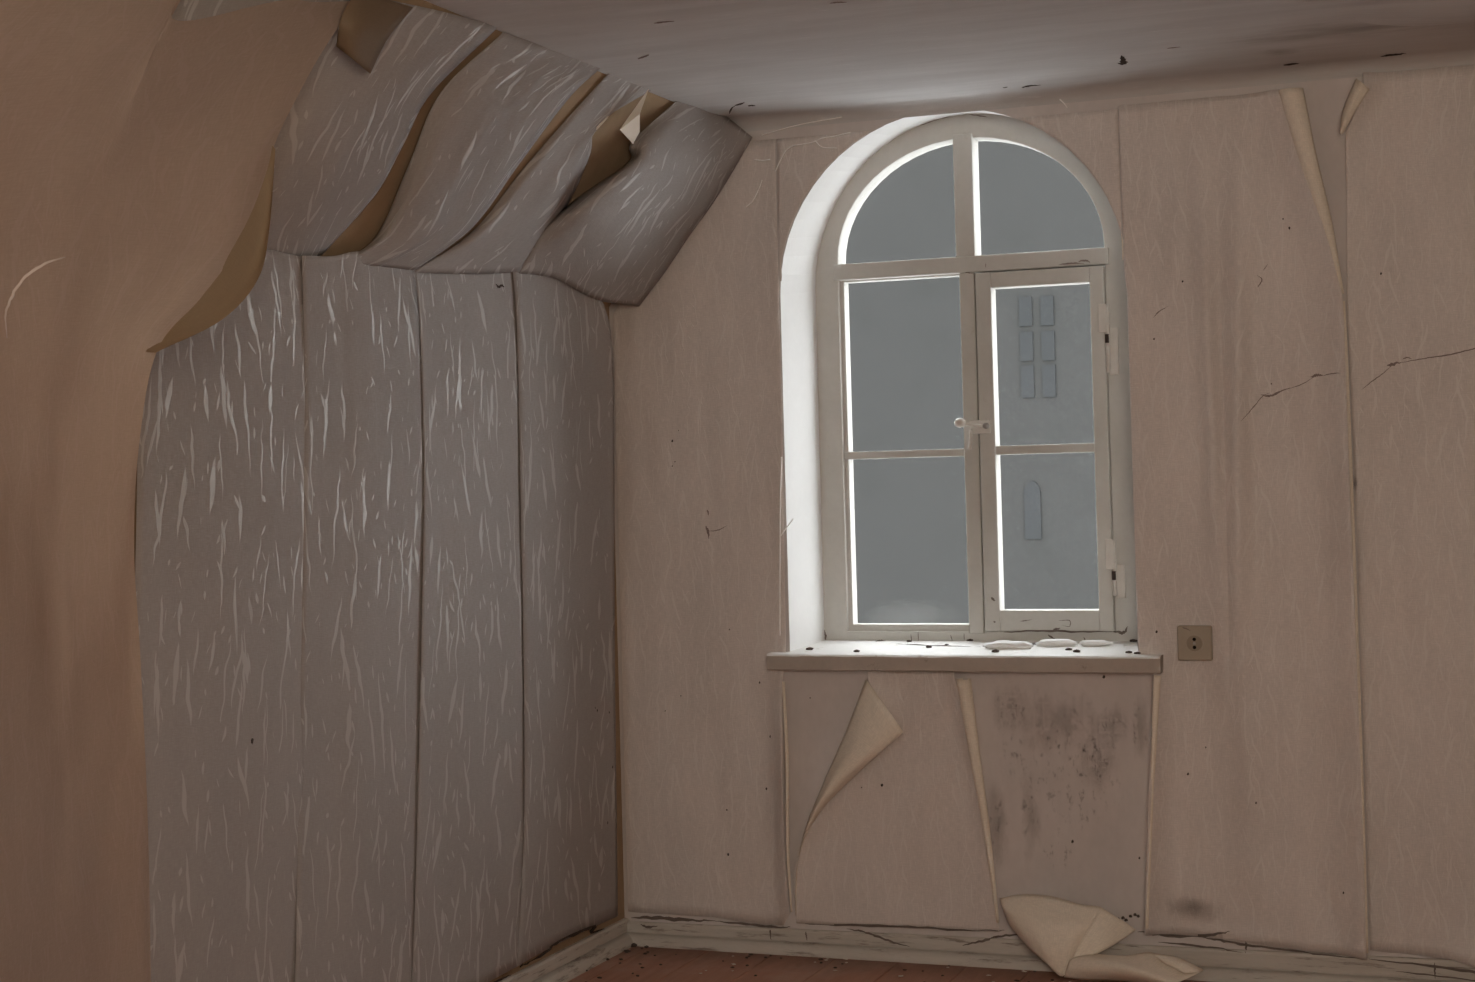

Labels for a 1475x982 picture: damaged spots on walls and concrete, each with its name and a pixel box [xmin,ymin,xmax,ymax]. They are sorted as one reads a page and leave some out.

crack [1241,348,1475,421]